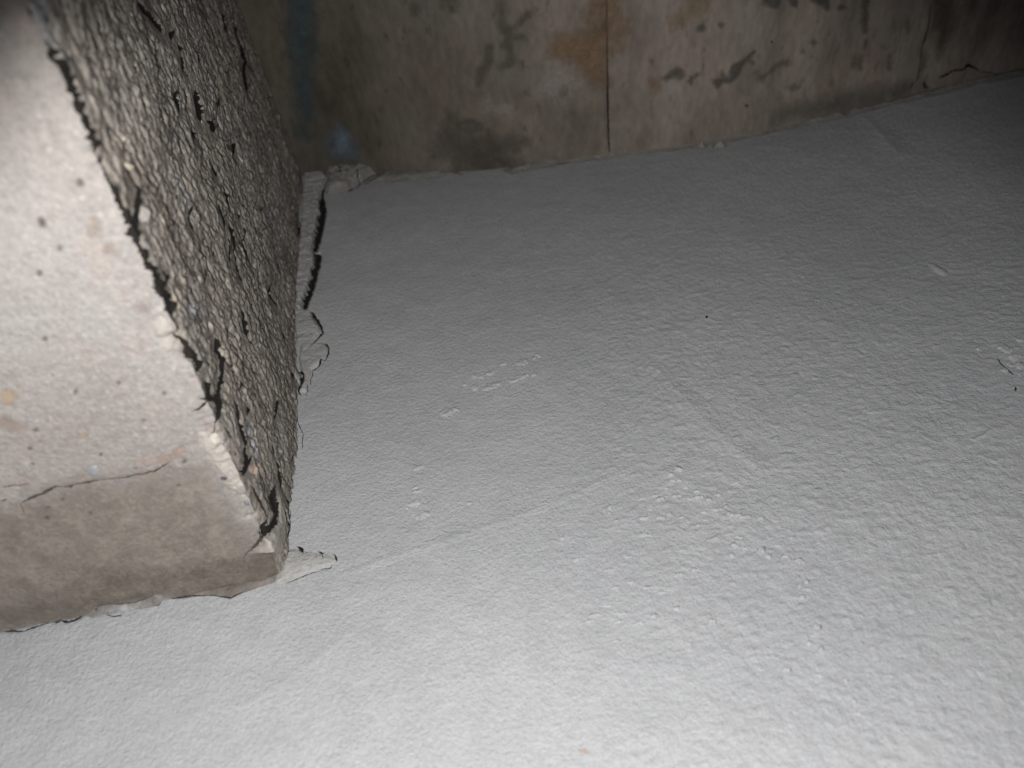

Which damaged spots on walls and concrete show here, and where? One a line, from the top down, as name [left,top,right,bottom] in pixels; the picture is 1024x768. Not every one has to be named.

water stain [715,52,754,87]
flaking render [138,204,151,222]
flaking render [191,211,200,227]
flaking render [172,292,198,315]
crack [27,0,378,582]
spalling [152,316,178,354]
crack [0,461,171,511]
spalling [198,431,259,505]
spalling [175,552,278,599]